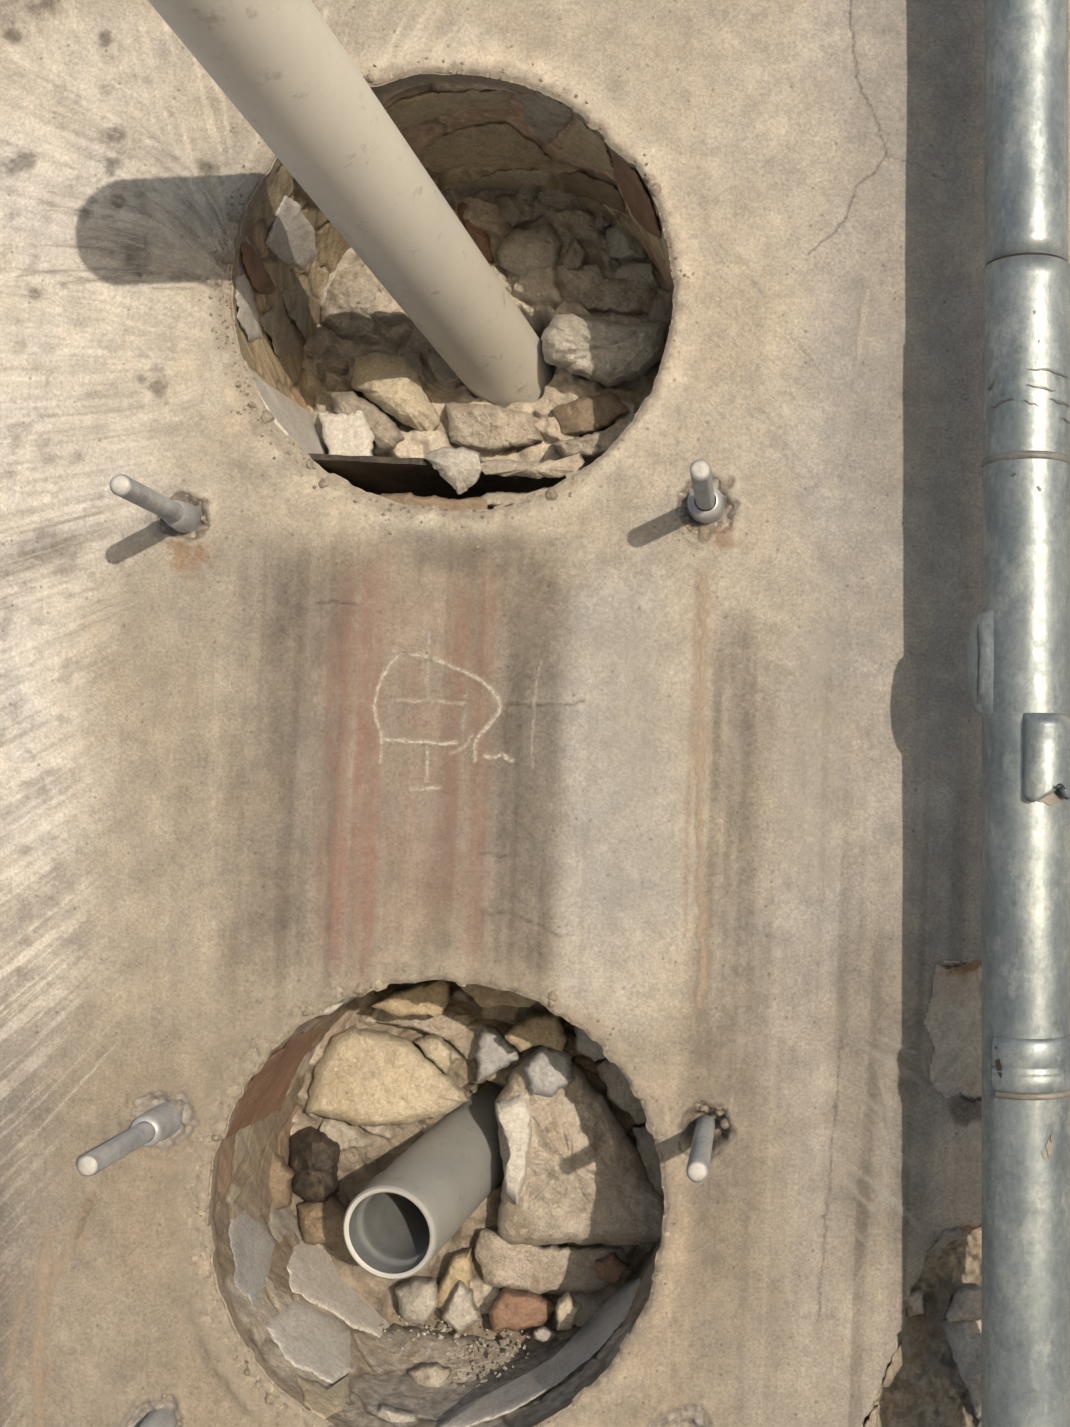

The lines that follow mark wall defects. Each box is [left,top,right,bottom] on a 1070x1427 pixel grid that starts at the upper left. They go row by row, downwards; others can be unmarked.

flaking render [924,960,982,1122]
spalling [864,1227,982,1427]